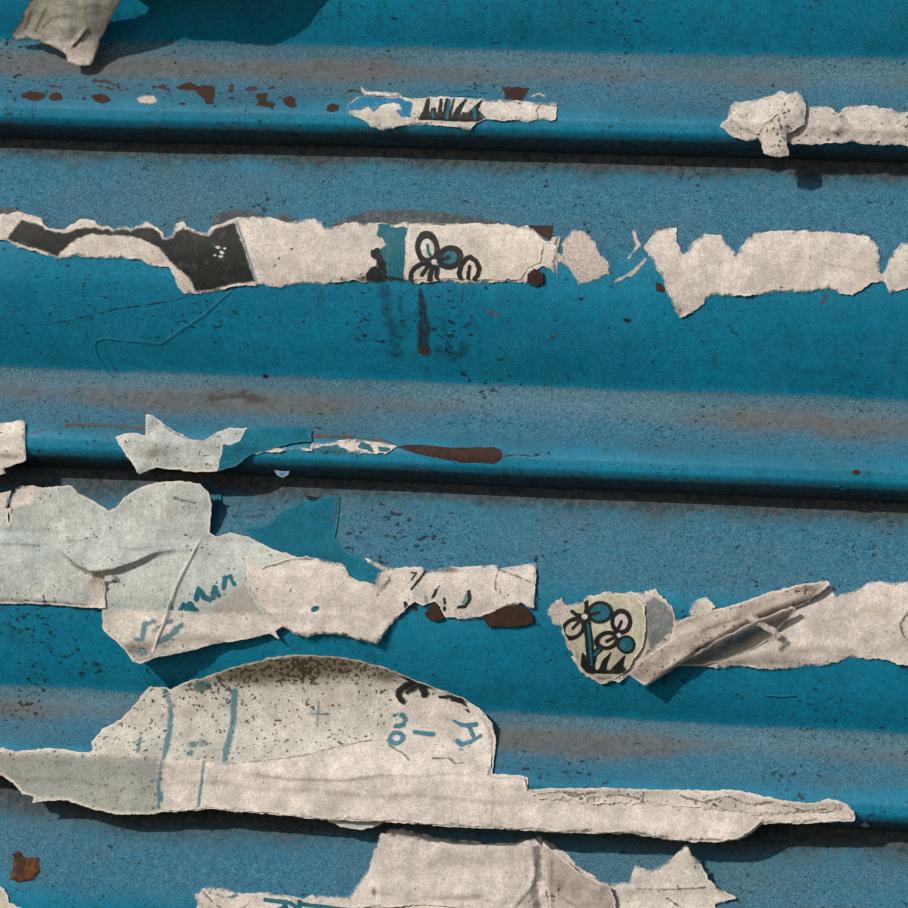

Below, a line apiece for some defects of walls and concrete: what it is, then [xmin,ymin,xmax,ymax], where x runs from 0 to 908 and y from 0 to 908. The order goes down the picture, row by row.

corrosion [21,85,63,101]
corrosion [77,79,141,103]
corrosion [152,82,215,104]
corrosion [245,86,297,108]
corrosion [502,87,529,101]
corrosion [398,444,502,464]
corrosion [408,603,445,621]
corrosion [483,604,534,627]
corrosion [11,851,40,882]